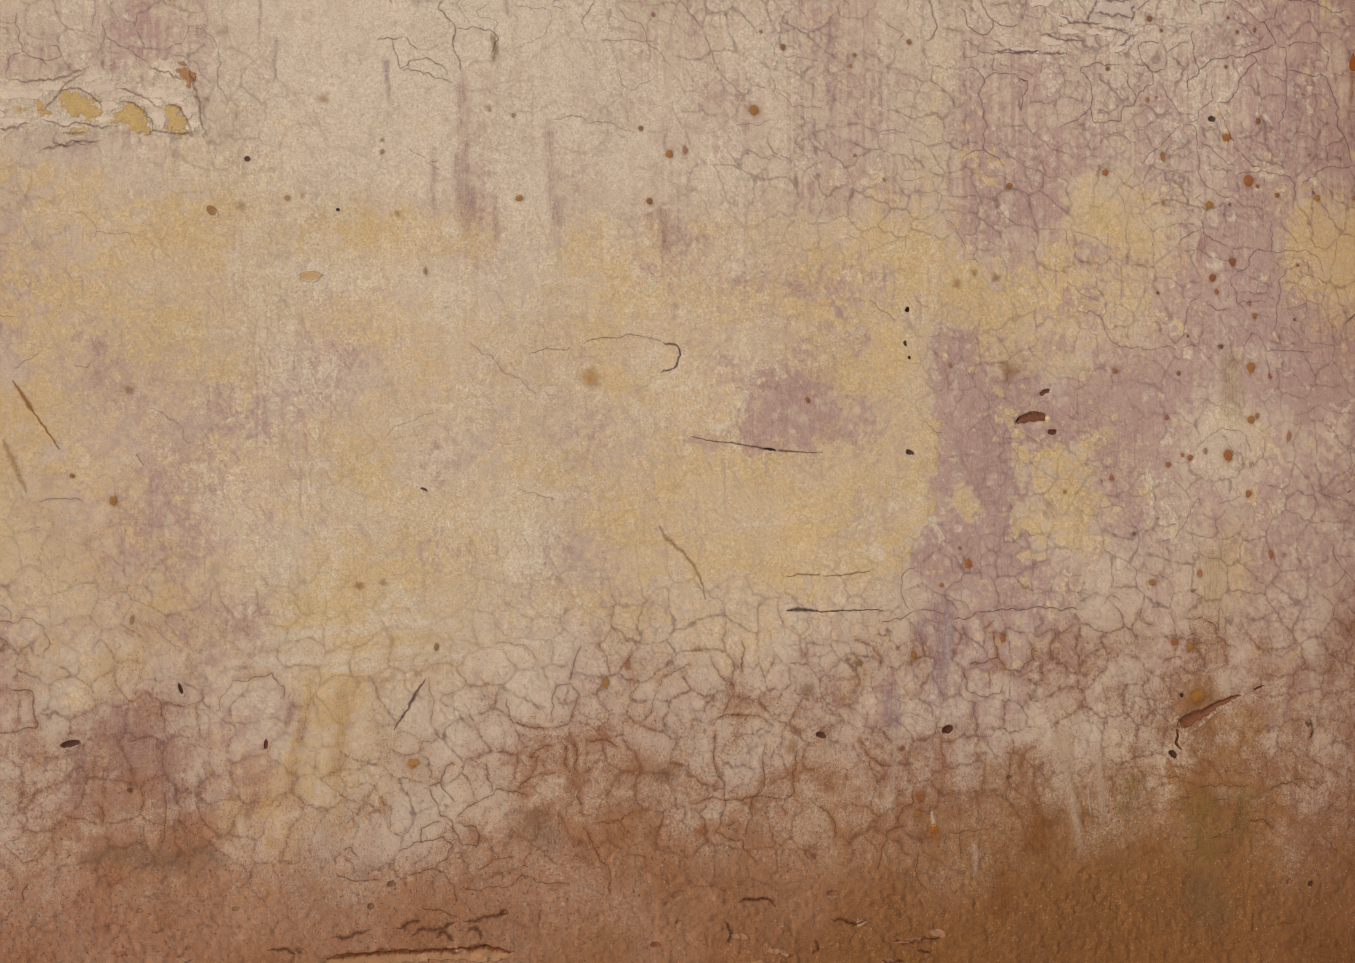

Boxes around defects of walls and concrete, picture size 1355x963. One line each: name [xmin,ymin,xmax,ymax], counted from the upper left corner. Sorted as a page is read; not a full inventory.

peeling [998,0,1137,54]
peeling [0,58,209,153]
crack [662,343,681,372]
spalling [1015,389,1056,440]
spalling [1168,685,1264,759]
spalling [326,910,514,963]
peeling [880,929,946,963]